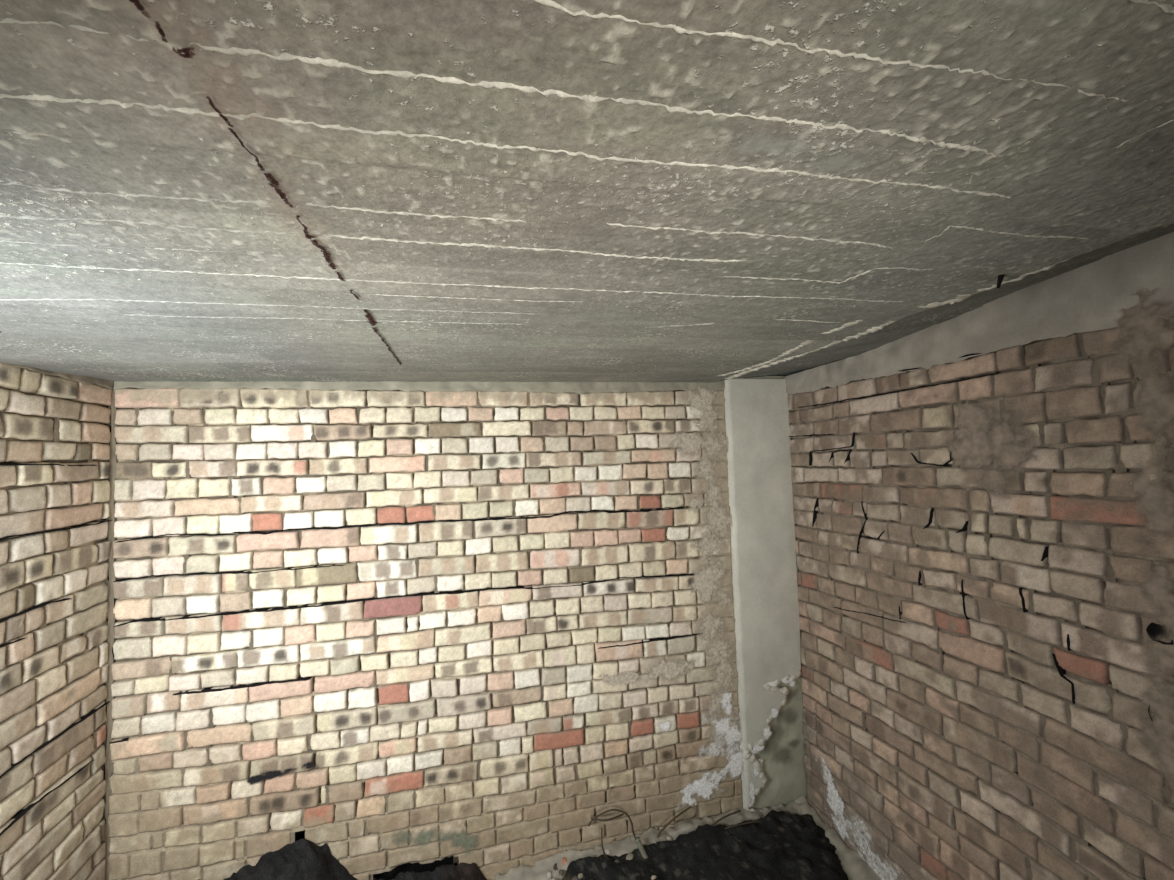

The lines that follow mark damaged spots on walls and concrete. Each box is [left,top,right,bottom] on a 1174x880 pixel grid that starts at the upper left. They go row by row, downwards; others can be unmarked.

corrosion [129,0,195,58]
corrosion [206,96,402,365]
crack [789,354,999,466]
crack [857,501,885,554]
crack [923,508,969,533]
crack [0,598,70,648]
crack [173,675,312,695]
crack [1052,634,1075,703]
crack [0,701,110,778]
crack [0,738,129,836]
damp [680,693,763,805]
damp [822,757,899,880]